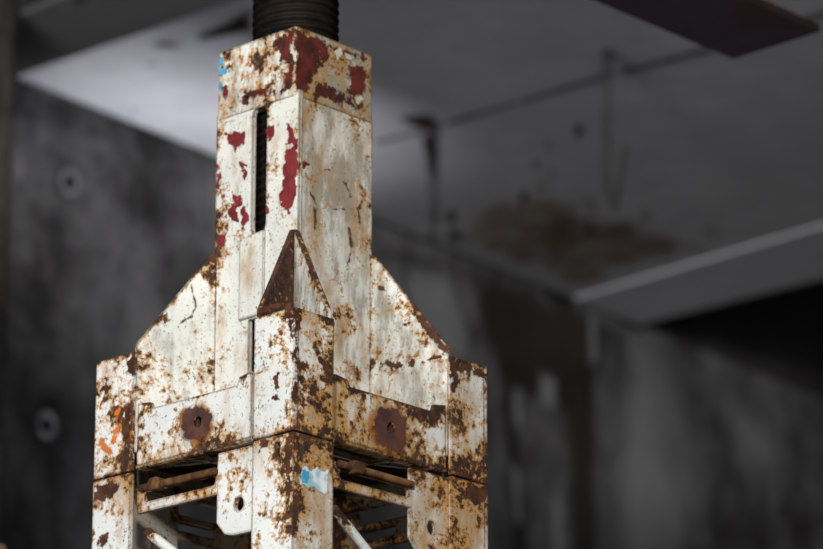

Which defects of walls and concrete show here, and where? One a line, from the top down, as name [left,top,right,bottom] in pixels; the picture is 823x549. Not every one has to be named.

peeling [238,28,368,112]
peeling [224,131,245,152]
peeling [279,123,310,214]
peeling [225,194,249,229]
corrosion [126,352,138,380]
corrosion [256,299,308,371]
corrosion [380,313,490,392]
corrosion [97,406,133,455]
corrosion [179,403,213,447]
corrosion [368,403,411,456]
corrosion [94,481,119,502]
corrosion [281,431,294,514]